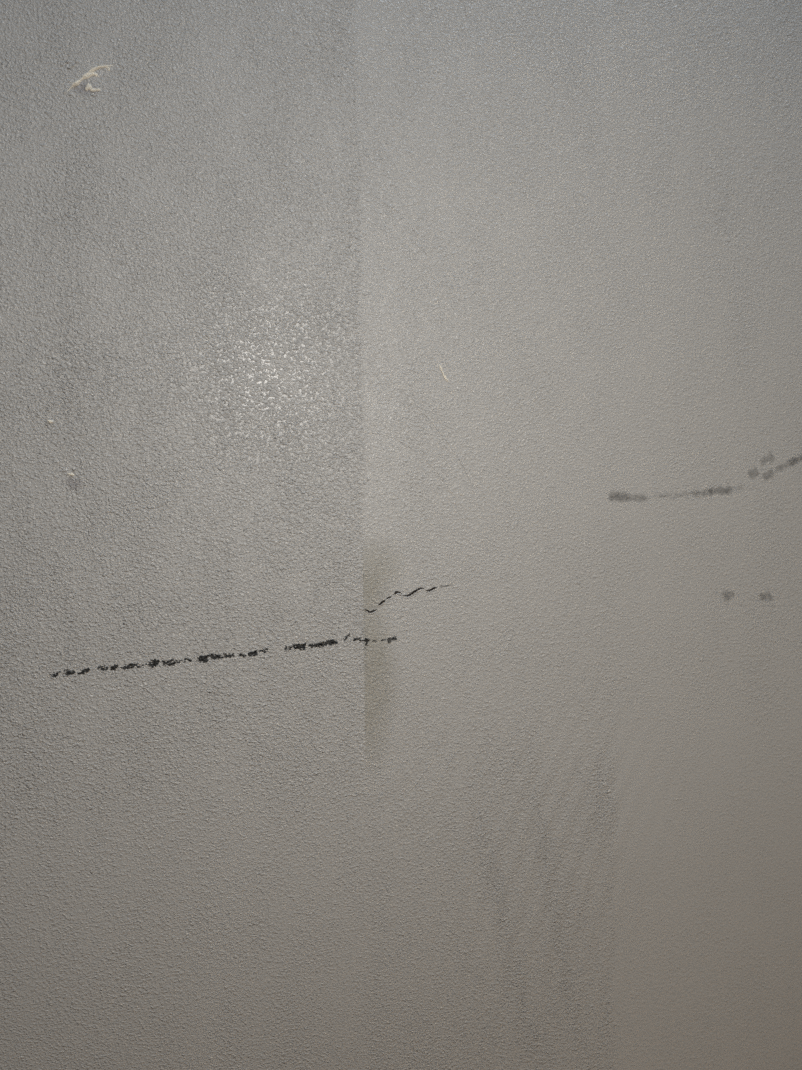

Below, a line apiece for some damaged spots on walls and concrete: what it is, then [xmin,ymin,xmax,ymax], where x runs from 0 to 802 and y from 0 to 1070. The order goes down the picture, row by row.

peeling [60,60,113,97]
crack [364,587,437,615]